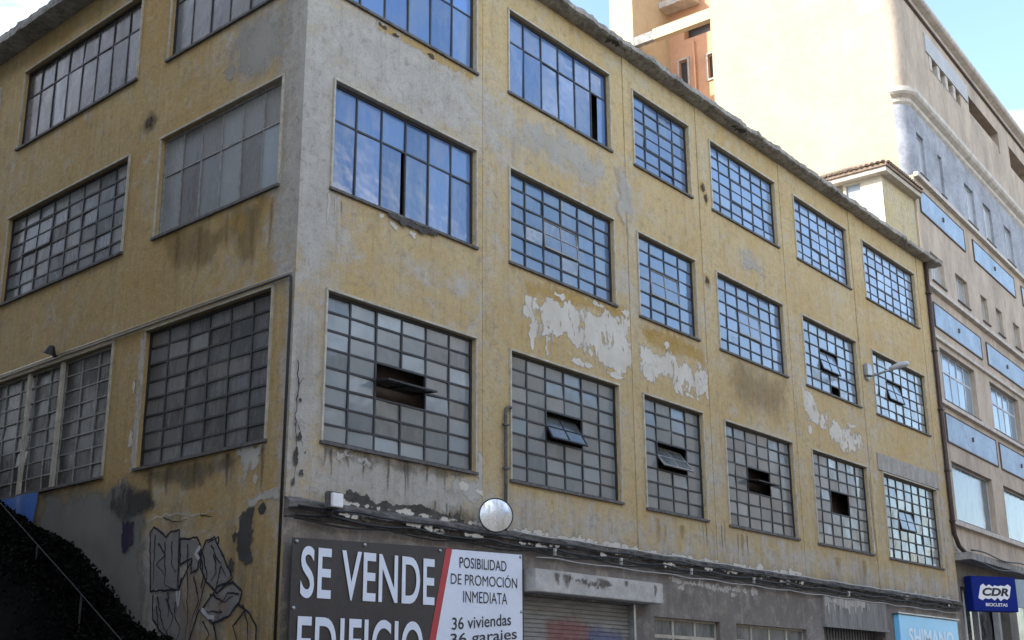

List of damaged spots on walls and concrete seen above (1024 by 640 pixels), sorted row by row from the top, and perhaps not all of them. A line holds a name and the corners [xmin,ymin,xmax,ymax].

peeling [523,292,709,401]
crack [294,360,304,478]
peeling [802,383,864,454]
leakage [337,449,371,467]
spalling [343,489,466,524]